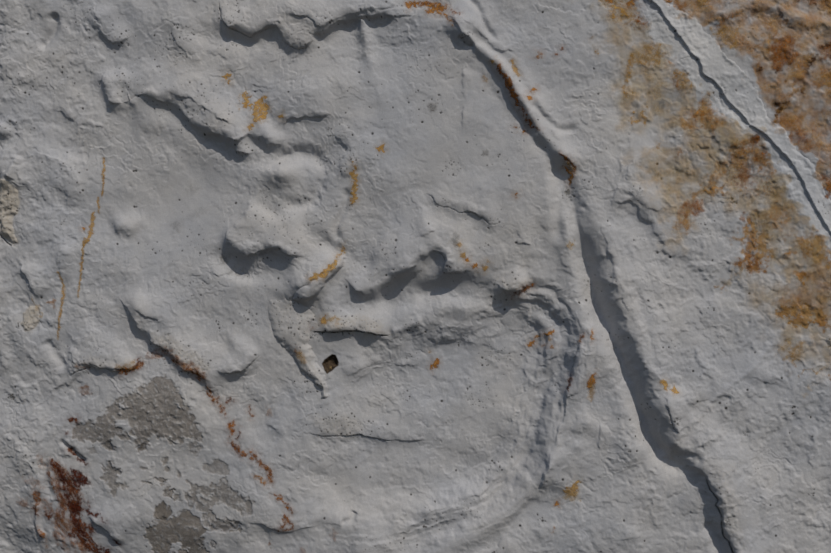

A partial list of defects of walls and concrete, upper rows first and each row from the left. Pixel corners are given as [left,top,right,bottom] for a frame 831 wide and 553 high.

rust [405,1,460,26]
rust [491,60,538,133]
rust [118,358,144,375]
rust [228,421,272,484]
rust [32,448,121,553]
flaking render [144,481,209,553]